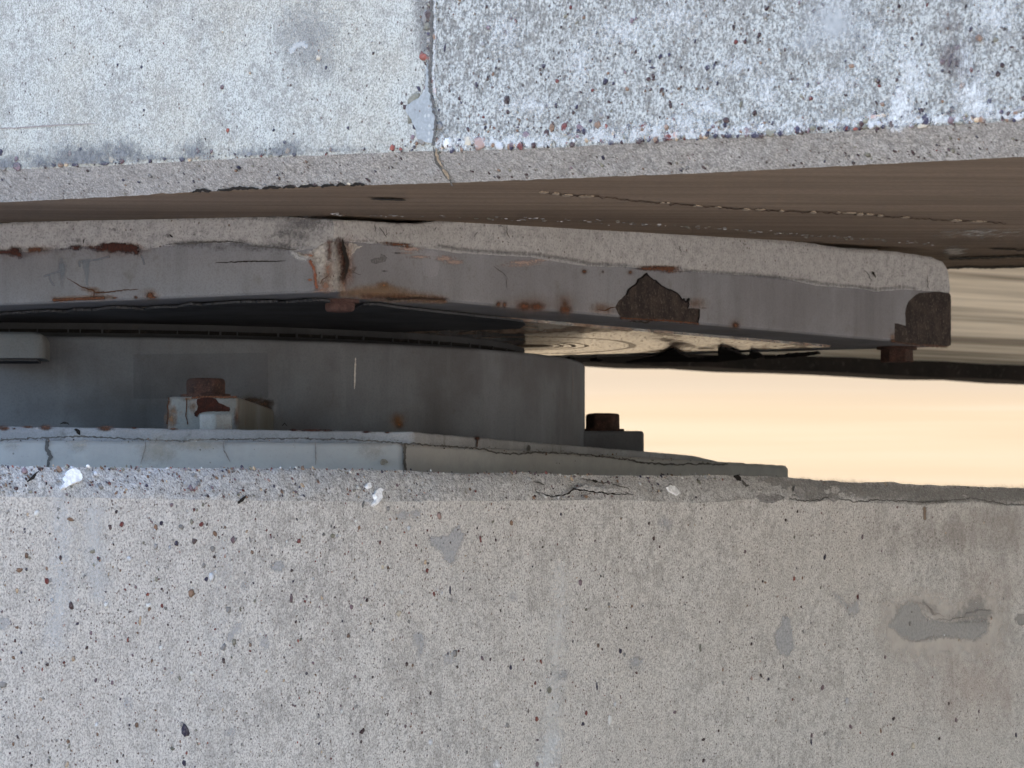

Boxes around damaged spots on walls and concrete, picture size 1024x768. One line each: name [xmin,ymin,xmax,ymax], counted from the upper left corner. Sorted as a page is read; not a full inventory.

crack [428,0,437,146]
rust [0,247,44,258]
rust [61,242,139,255]
peeling [597,266,700,325]
crack [534,478,634,497]
spalling [887,595,1001,655]